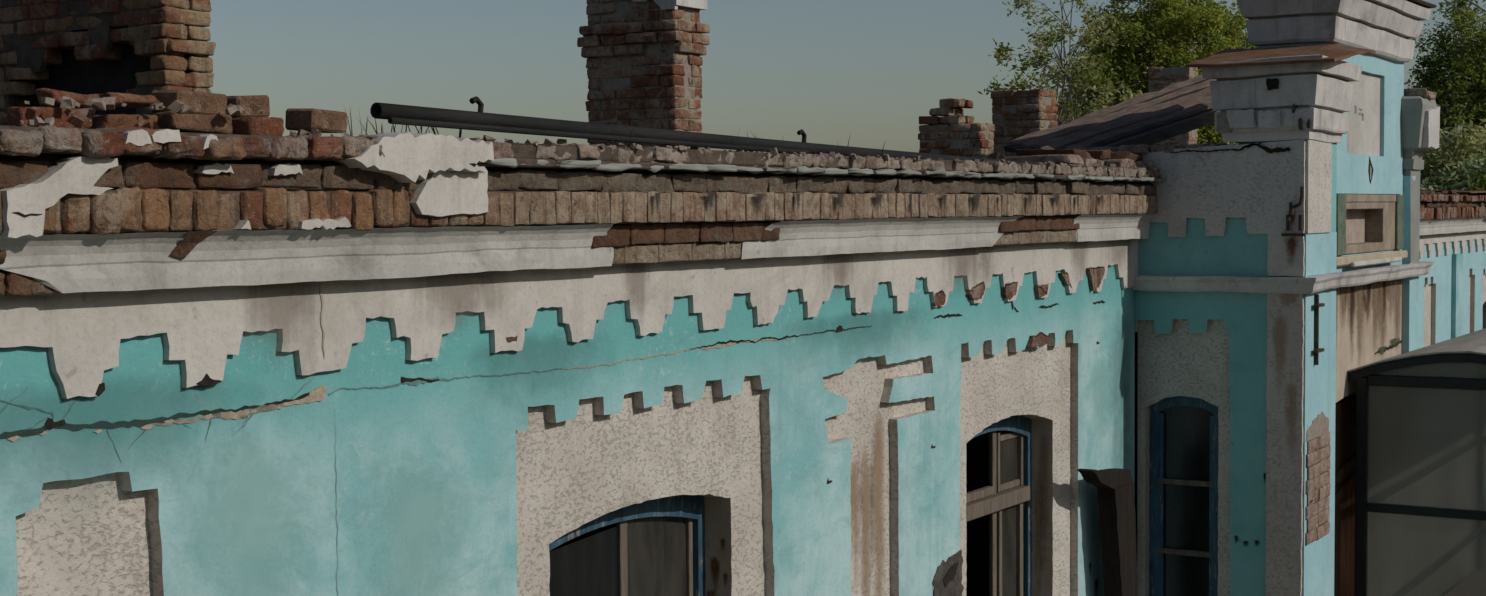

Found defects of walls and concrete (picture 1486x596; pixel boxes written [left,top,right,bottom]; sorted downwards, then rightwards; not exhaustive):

flaking render [0,129,181,238]
flaking render [193,134,234,174]
flaking render [268,163,303,176]
flaking render [335,132,494,217]
spalling [171,231,217,259]
flaking render [235,220,251,230]
flaking render [297,217,351,230]
spalling [931,290,946,306]
spalling [966,266,1105,300]
leakage [1336,279,1402,353]
crack [0,325,872,463]
leakage [851,428,882,590]